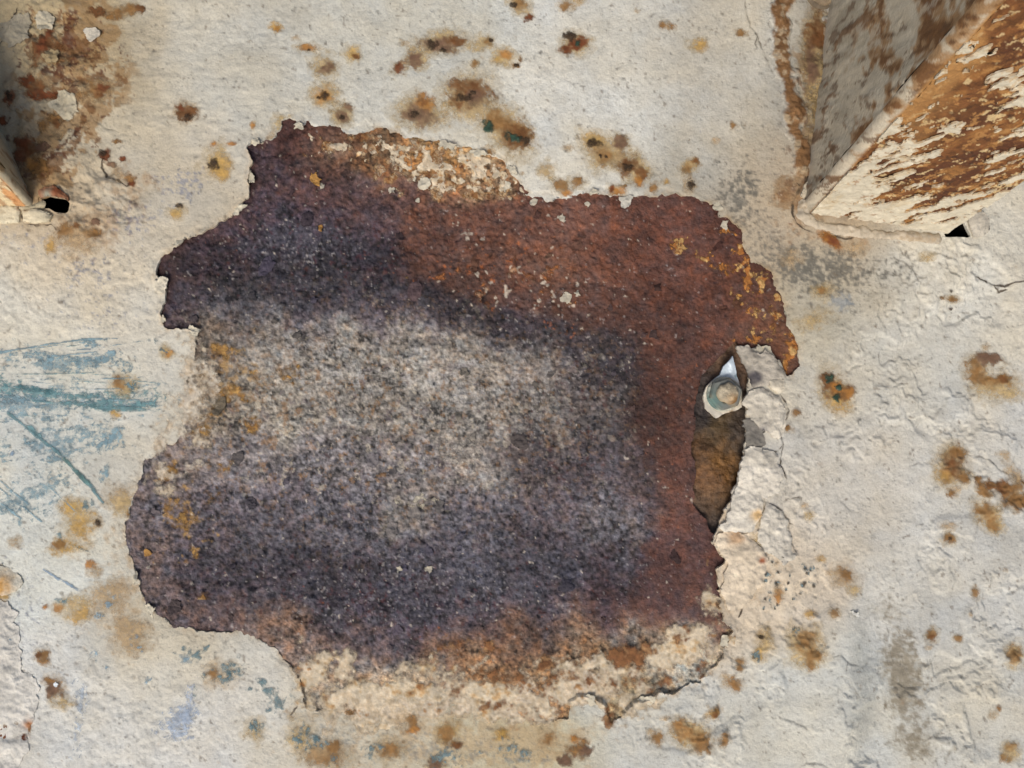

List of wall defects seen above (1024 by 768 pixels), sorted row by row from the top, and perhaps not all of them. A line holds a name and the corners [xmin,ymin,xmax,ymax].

corrosion [88,3,146,20]
corrosion [510,0,534,23]
corrosion [558,31,591,55]
corrosion [0,29,65,125]
corrosion [295,37,353,124]
corrosion [393,29,535,157]
corrosion [99,139,135,187]
corrosion [583,132,668,196]
corrosion [819,372,855,412]
corrosion [964,345,1019,399]
peeling [125,118,800,736]
corrosion [934,442,1024,534]